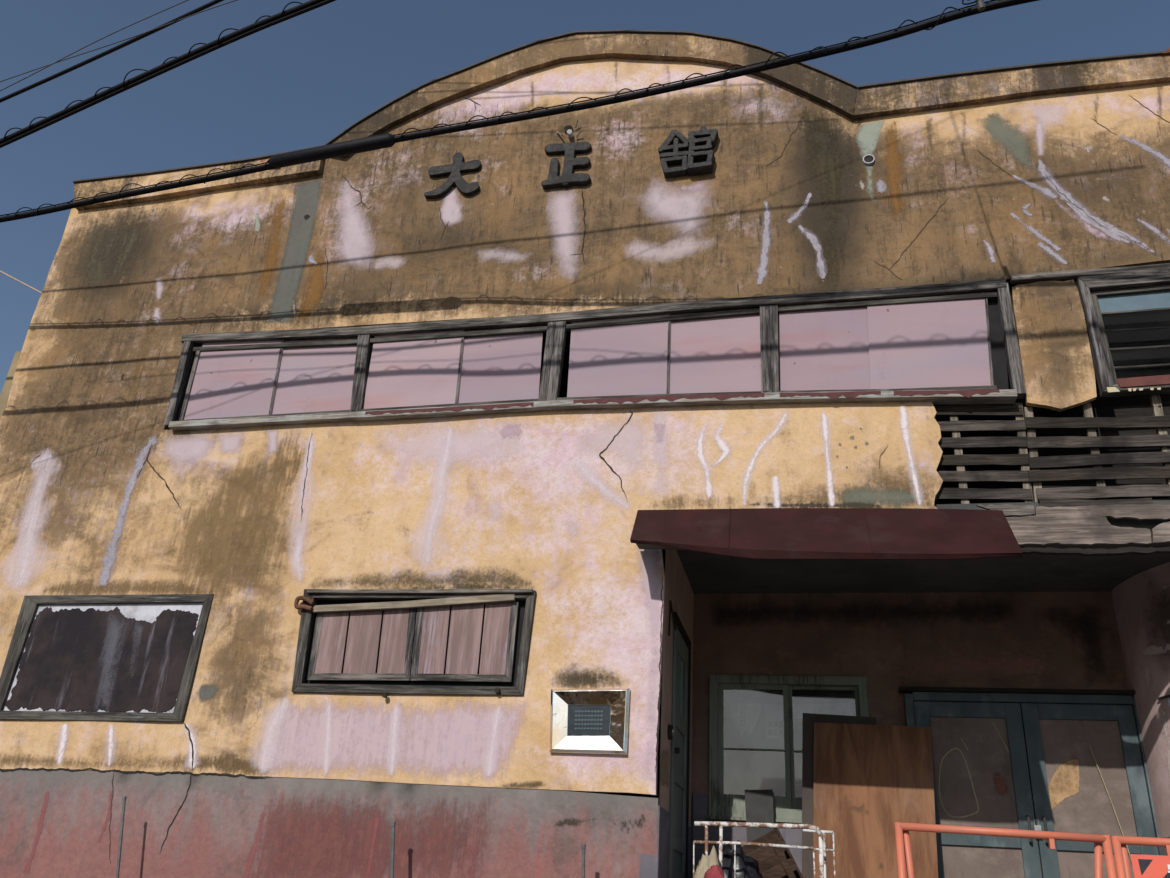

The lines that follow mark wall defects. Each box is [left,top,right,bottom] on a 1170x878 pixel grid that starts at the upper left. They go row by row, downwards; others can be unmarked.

peeling [549,193,575,272]
peeling [630,183,704,258]
crack [873,202,945,280]
crack [576,411,633,508]
crack [99,434,182,586]
damp [44,443,299,595]
crack [0,700,288,864]